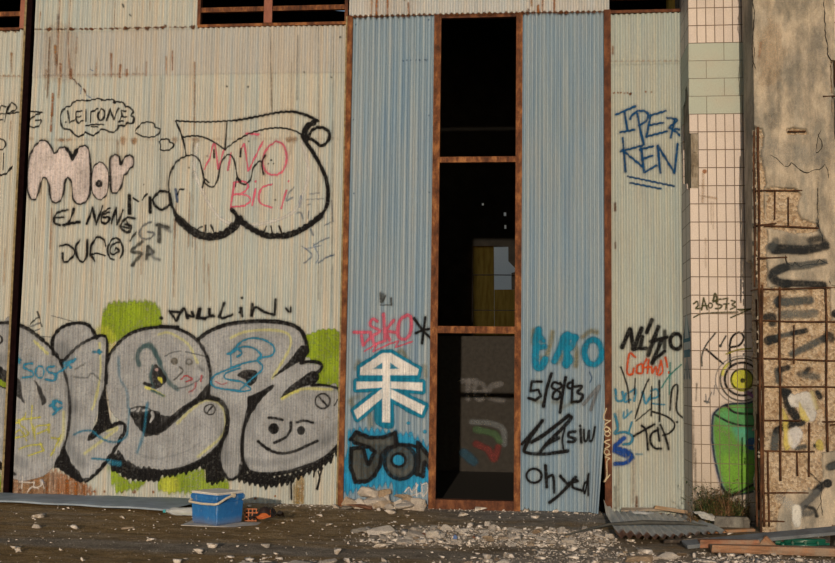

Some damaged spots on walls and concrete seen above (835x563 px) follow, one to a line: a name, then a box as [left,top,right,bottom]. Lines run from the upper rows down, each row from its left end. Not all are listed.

corrosion [35,25,195,132]
crack [771,131,829,233]
spalling [749,127,835,532]
corrosion [13,470,105,495]